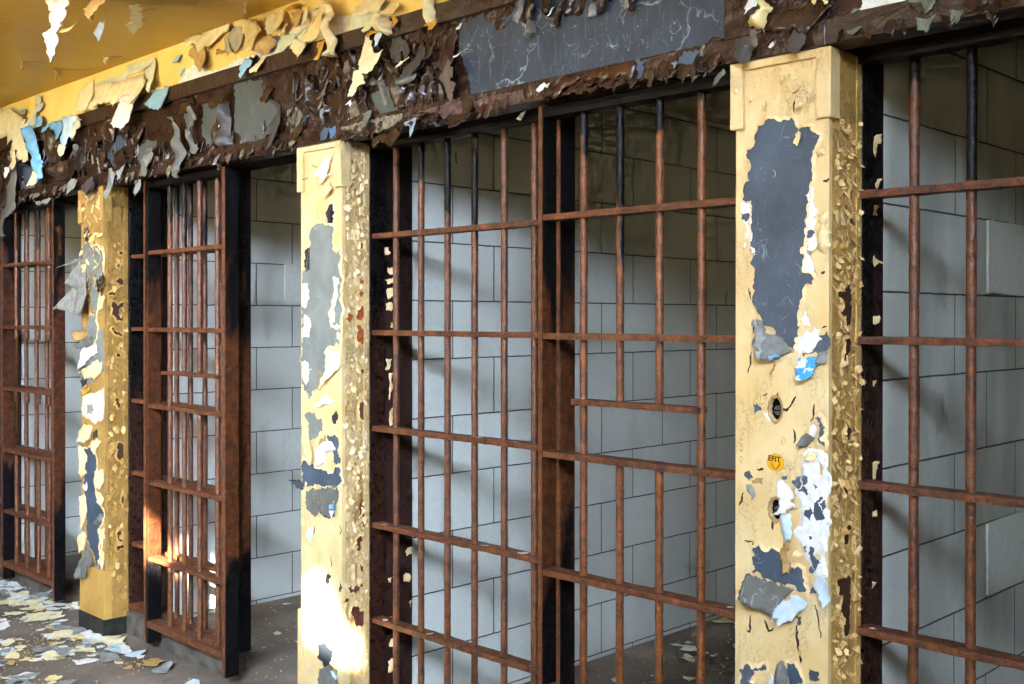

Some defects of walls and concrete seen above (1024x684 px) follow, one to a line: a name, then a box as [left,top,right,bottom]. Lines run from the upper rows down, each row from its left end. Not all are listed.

peeling [0,0,726,684]
peeling [728,87,887,684]